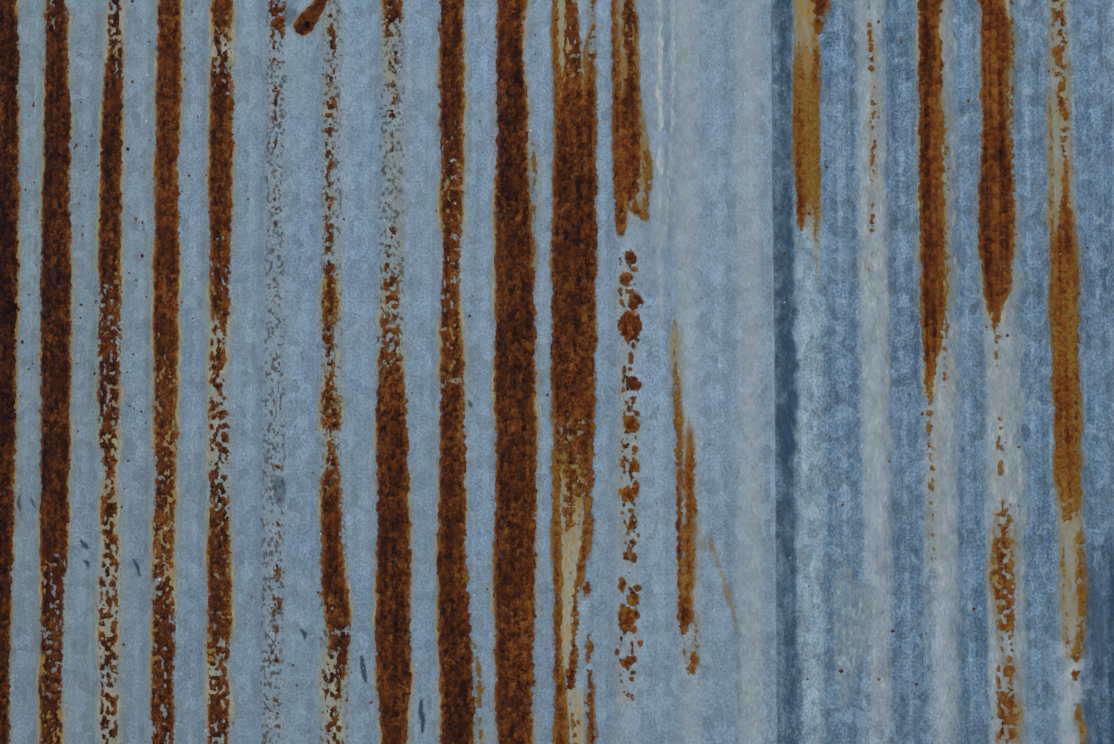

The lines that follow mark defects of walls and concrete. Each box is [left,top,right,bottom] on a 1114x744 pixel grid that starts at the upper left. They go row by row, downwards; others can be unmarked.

rust [0,0,249,744]
rust [251,0,354,744]
rust [362,0,415,744]
rust [434,0,652,744]
rust [670,320,699,675]
rust [785,0,831,242]
rust [900,0,953,560]
rust [967,0,1021,367]
rust [989,500,1022,744]
rust [996,412,1020,475]
rust [1035,0,1093,681]
rust [1074,703,1088,744]